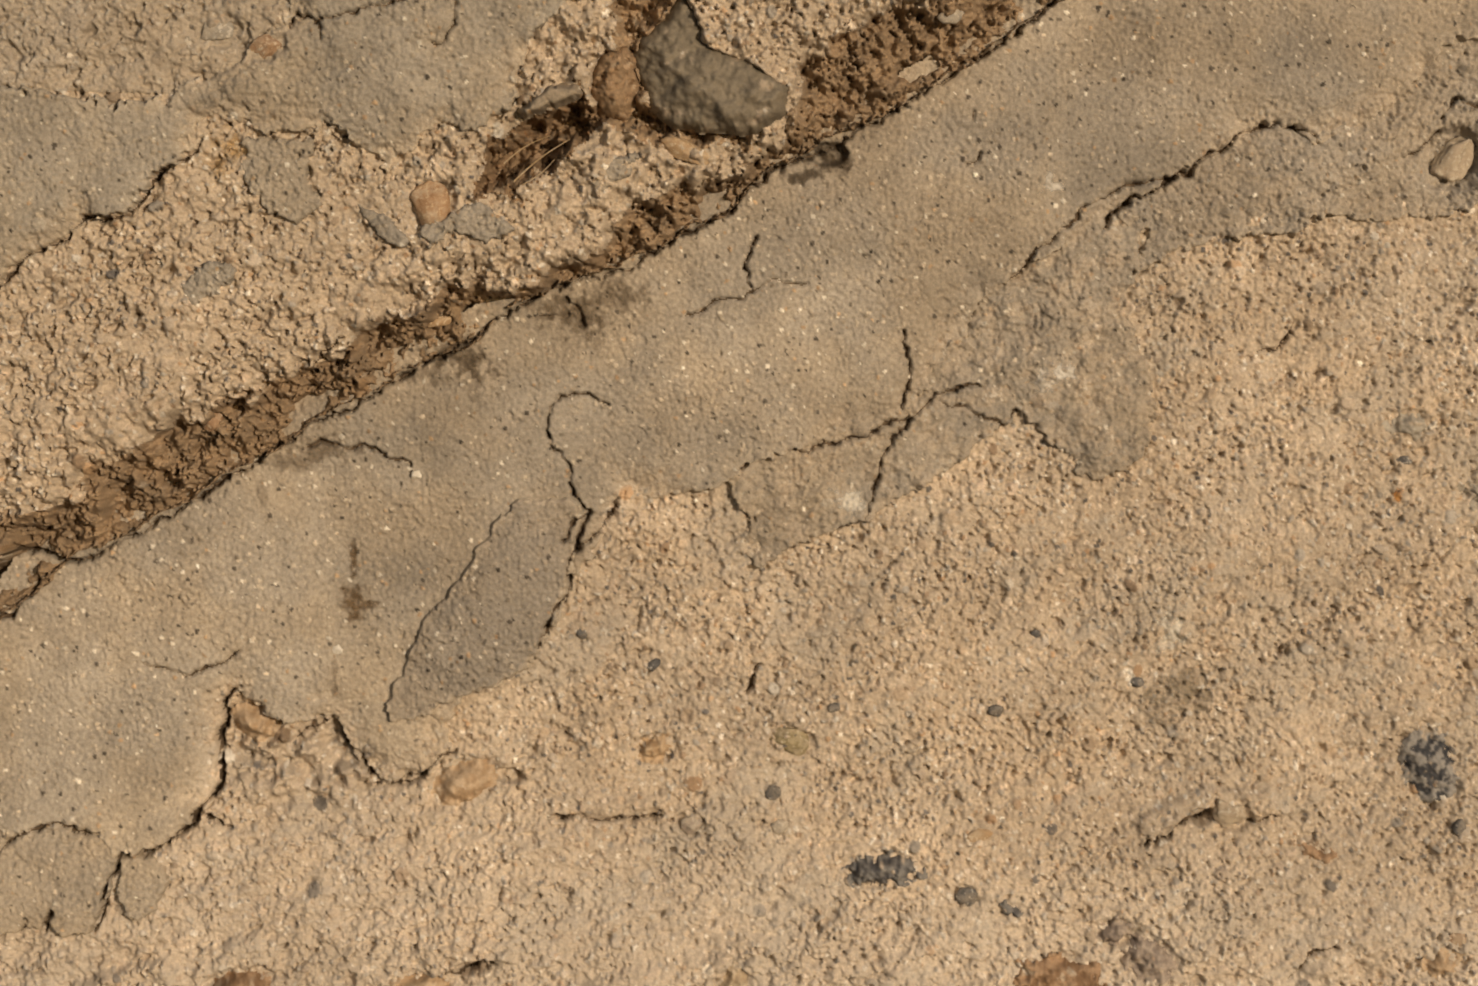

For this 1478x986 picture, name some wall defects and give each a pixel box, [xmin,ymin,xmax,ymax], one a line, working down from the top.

spalling [0,0,929,520]
crack [0,0,1059,649]
crack [1009,123,1318,280]
crack [1403,96,1478,158]
crack [0,650,242,932]
spalling [0,203,1478,986]
crack [746,663,759,692]